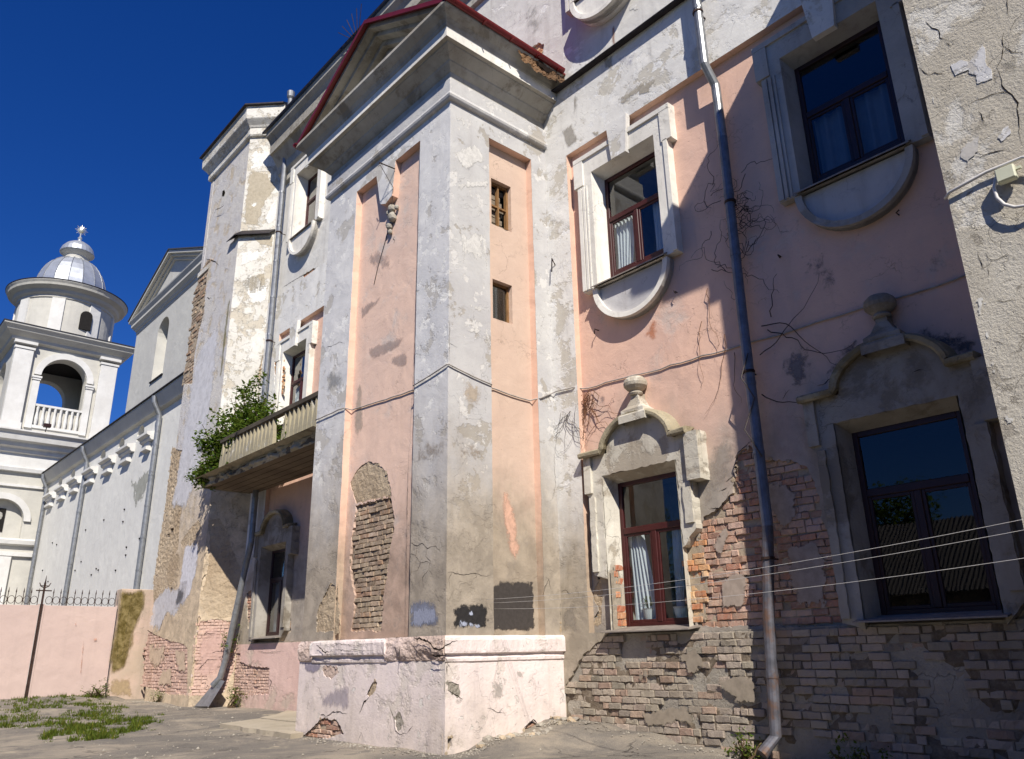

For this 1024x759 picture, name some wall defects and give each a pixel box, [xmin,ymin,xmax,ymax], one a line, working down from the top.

peeling [951,45,993,84]
crack [926,3,1022,158]
water stain [117,594,132,658]
flaking render [140,446,270,696]
flaking render [317,583,340,635]
flaking render [349,461,395,632]
crack [317,611,462,699]
flaking render [682,446,842,628]
flaking render [306,717,344,738]